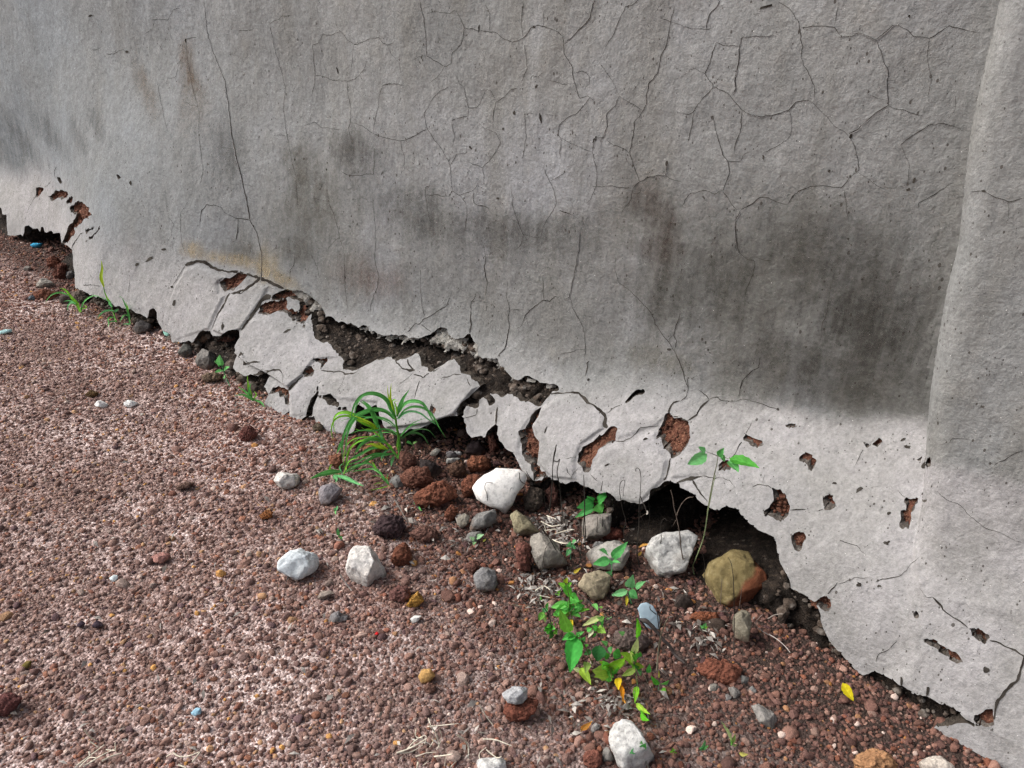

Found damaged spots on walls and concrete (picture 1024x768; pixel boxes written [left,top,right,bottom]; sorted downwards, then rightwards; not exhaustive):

flaking render [36,187,100,248]
crack [158,0,1022,501]
flaking render [258,290,323,328]
flaking render [518,401,548,483]
flaking render [577,426,617,472]
flaking render [656,413,690,458]
flaking render [764,488,790,522]
flaking render [899,493,927,529]
flaking render [790,531,806,552]
crack [828,540,917,594]
crack [925,596,968,628]
flaking render [924,639,963,664]